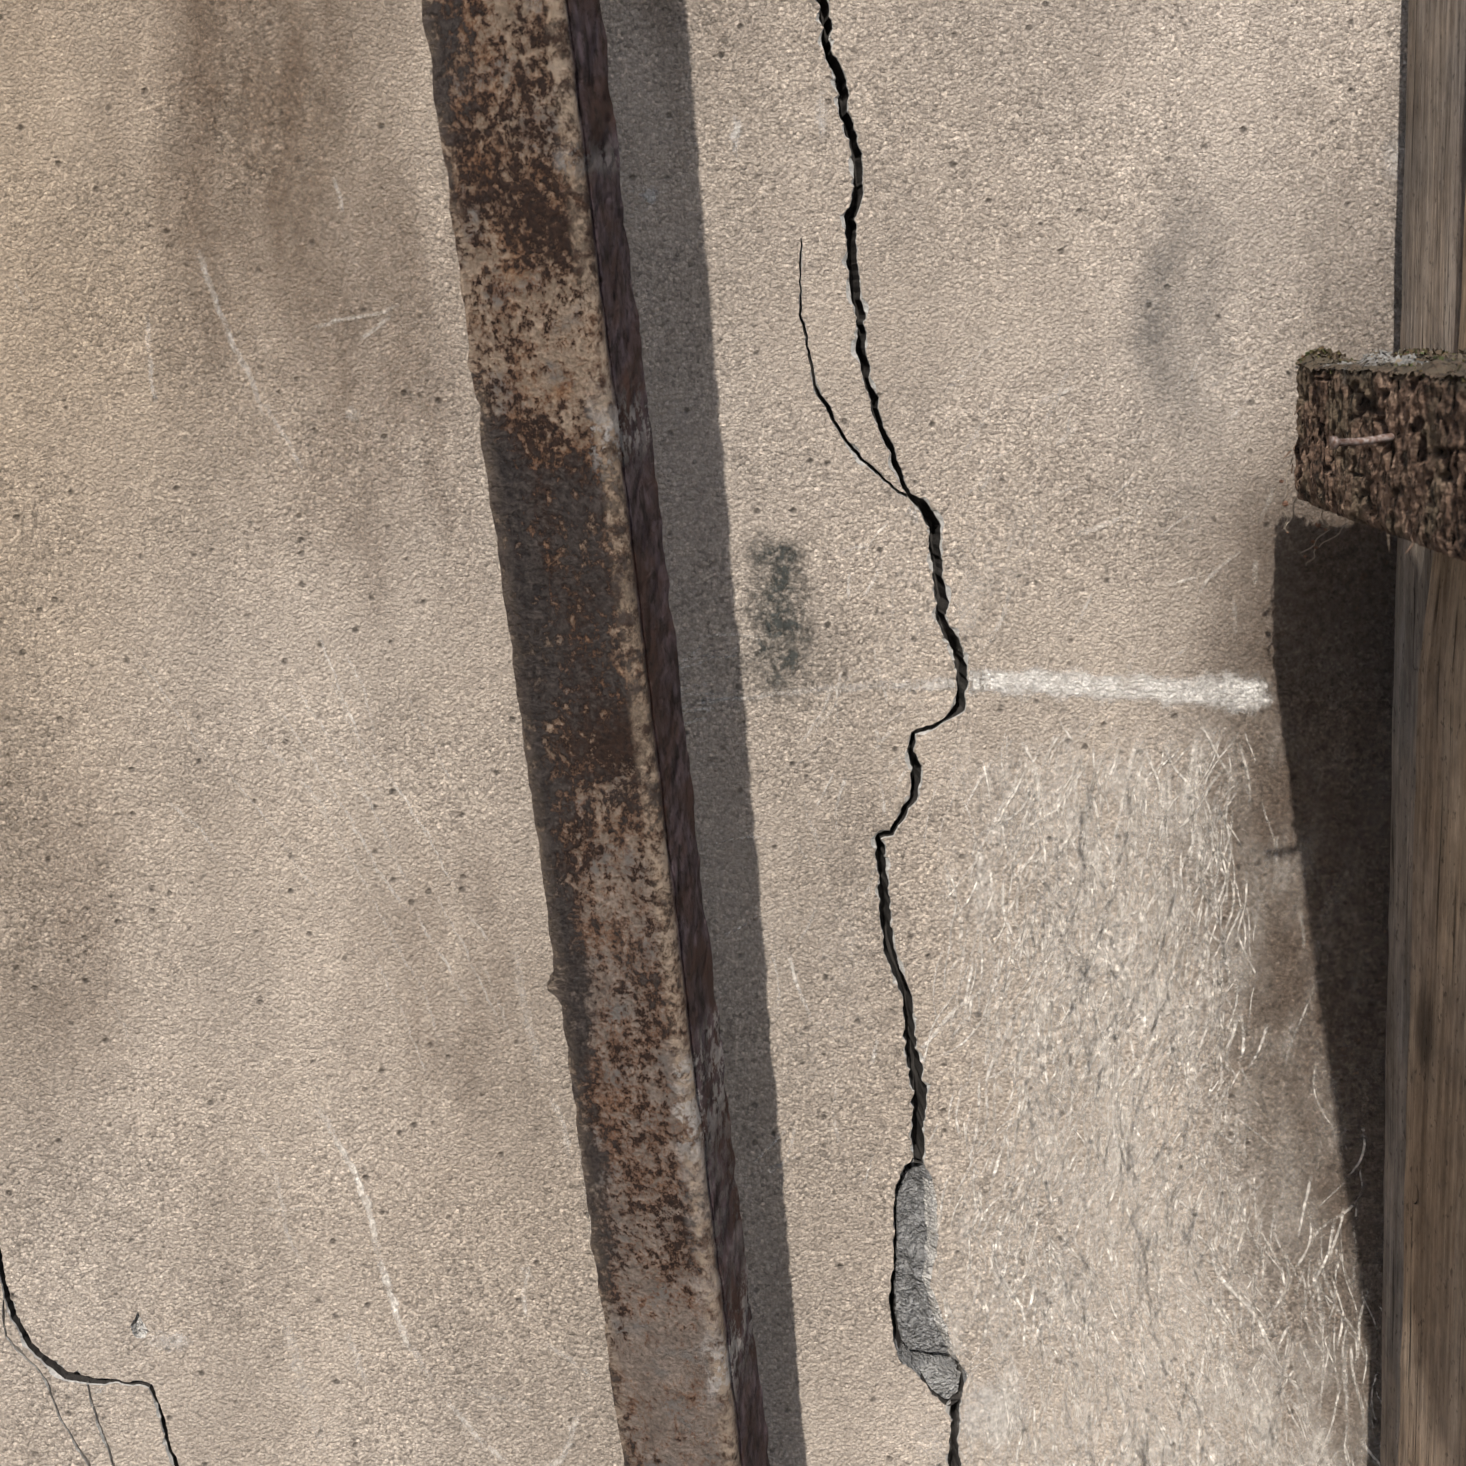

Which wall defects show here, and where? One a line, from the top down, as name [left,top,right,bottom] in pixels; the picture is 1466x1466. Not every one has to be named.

mould [751,544,811,687]
crack [799,0,969,1163]
damp [924,507,1397,1466]
crack [0,1249,179,1466]
spalling [889,1143,968,1406]
crack [945,1392,962,1466]